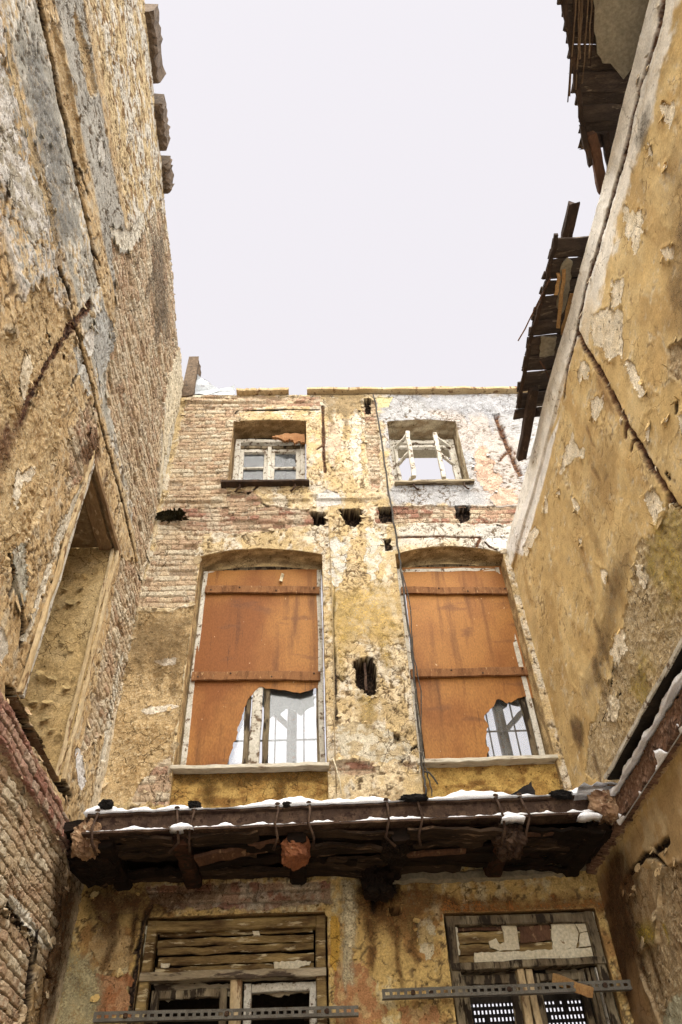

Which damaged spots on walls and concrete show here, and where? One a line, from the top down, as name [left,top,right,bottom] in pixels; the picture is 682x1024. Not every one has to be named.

peeling [0,30,58,246]
flaking render [51,17,106,177]
flaking render [621,204,645,255]
crack [19,251,95,424]
flaking render [0,209,350,807]
flaking render [359,445,519,581]
flaking render [541,488,580,514]
flaking render [556,431,585,475]
flaking render [588,278,647,398]
crack [572,311,682,508]
flaking render [585,485,682,875]
flaking render [640,857,682,1024]